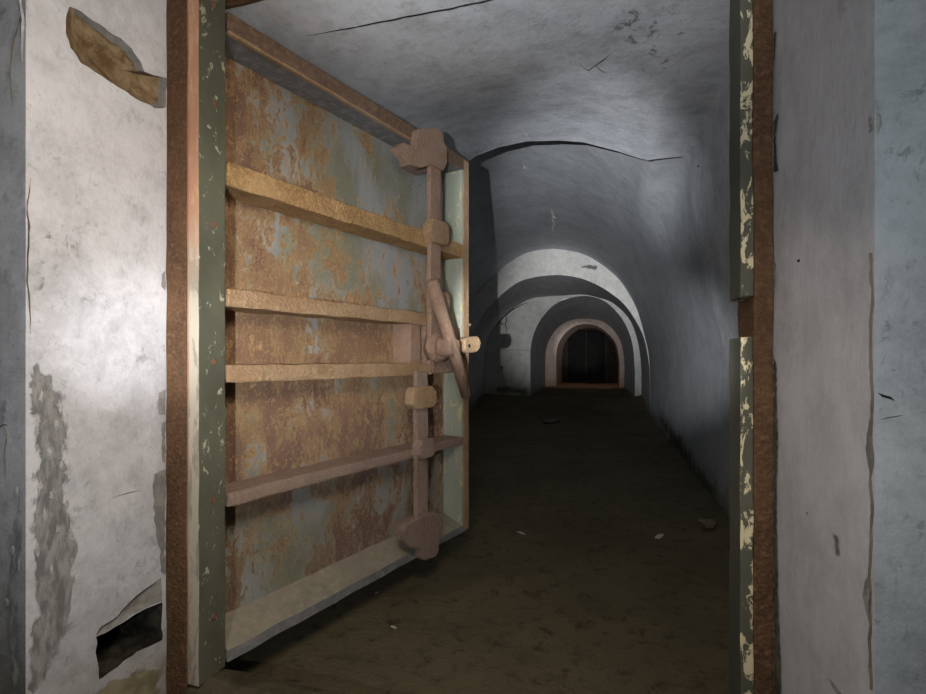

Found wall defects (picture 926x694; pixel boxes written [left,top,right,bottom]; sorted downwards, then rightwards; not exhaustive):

crack [8,0,25,108]
crack [309,0,492,36]
crack [24,178,32,334]
flaking render [5,365,78,694]
spalling [96,390,166,694]
flaking render [773,360,781,694]